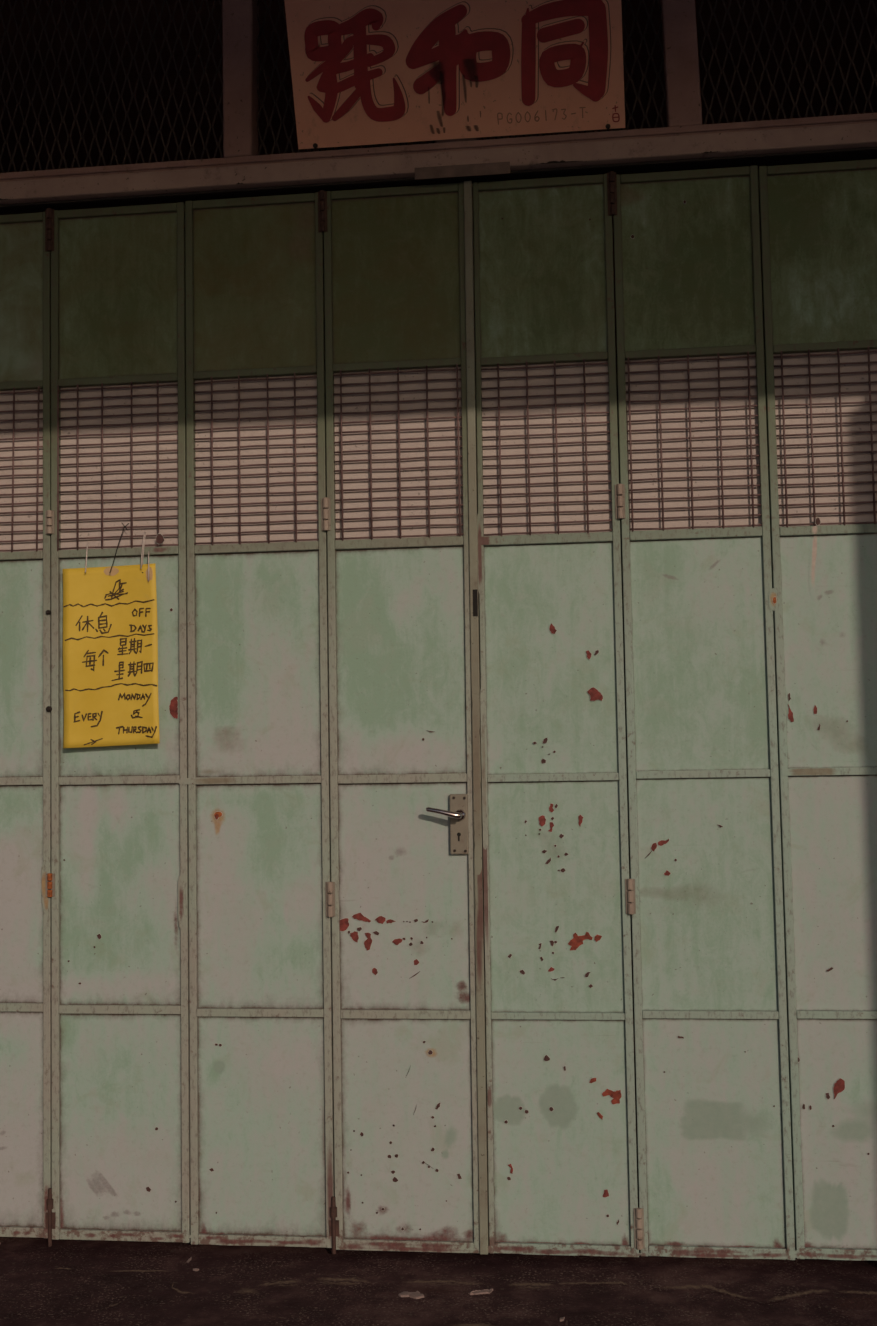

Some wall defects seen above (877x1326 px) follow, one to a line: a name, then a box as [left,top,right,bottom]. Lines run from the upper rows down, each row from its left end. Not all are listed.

peeling [587,687,603,701]
corrosion [205,803,230,839]
peeling [524,803,569,873]
peeling [645,839,669,858]
peeling [340,912,433,979]
peeling [538,926,602,981]
peeling [589,1077,622,1120]
peeling [825,1078,845,1100]